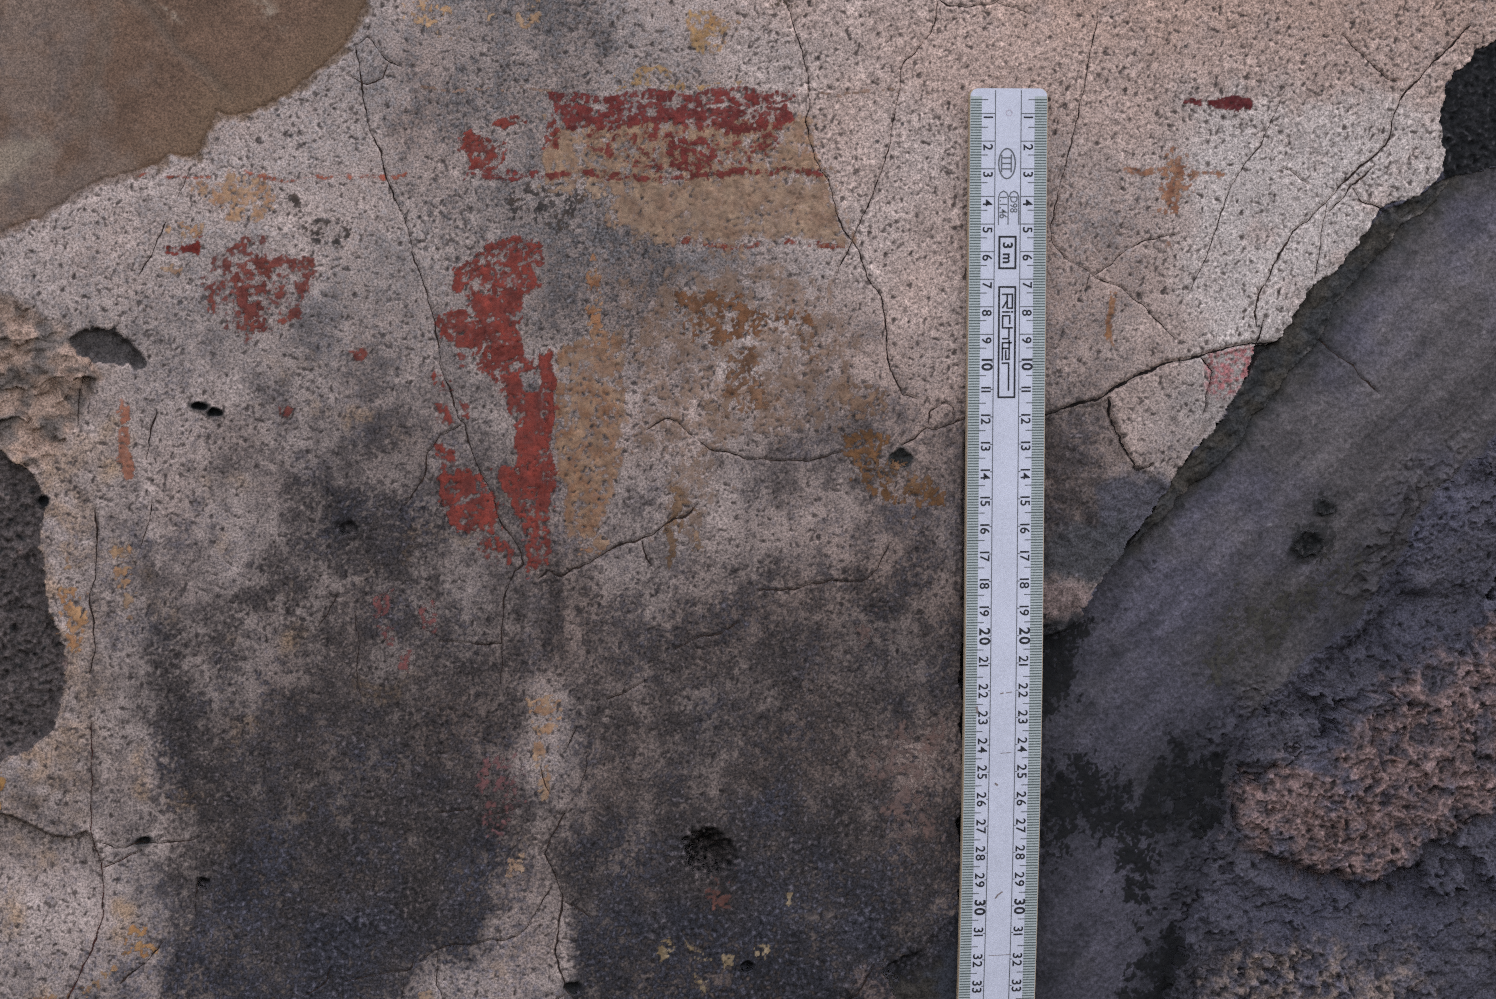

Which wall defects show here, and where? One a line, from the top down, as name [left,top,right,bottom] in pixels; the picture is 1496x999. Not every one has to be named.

spalling [0,450,70,764]
peeling [316,172,407,181]
crack [304,727,590,999]
crack [350,36,695,684]
damp [149,475,964,999]
crack [675,622,737,649]
crack [645,418,842,462]
crack [758,545,889,591]
crack [785,0,1030,445]
peeling [1157,146,1195,215]
peeling [1208,95,1253,112]
crack [1045,18,1471,471]